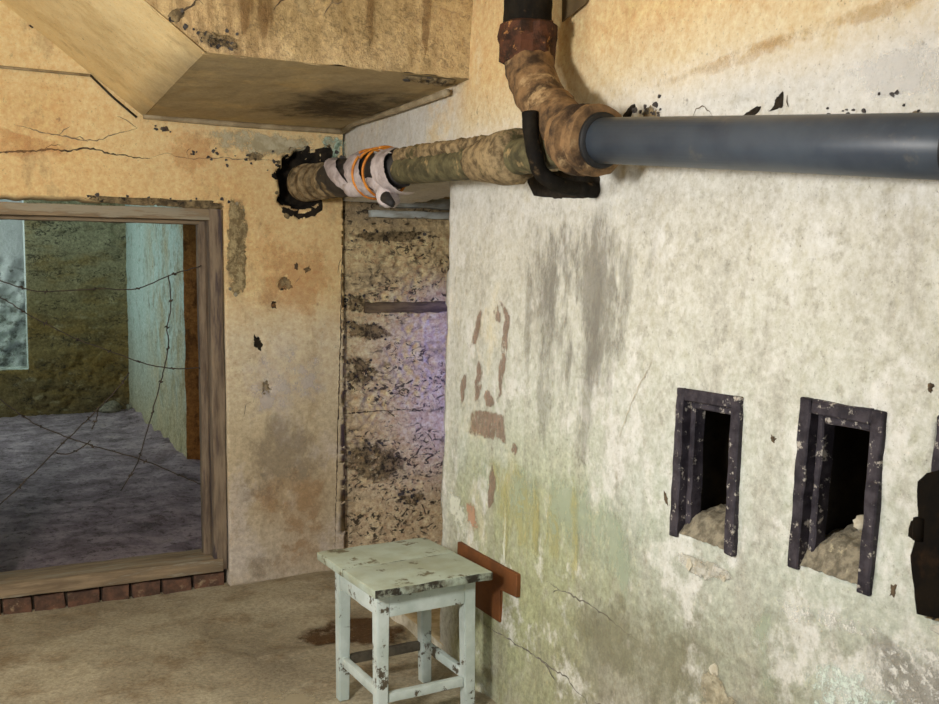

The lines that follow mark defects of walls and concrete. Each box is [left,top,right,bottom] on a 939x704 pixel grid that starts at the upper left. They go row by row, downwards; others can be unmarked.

crack [0,116,272,161]
spalling [272,144,345,219]
crack [552,585,638,641]
crack [486,625,614,704]